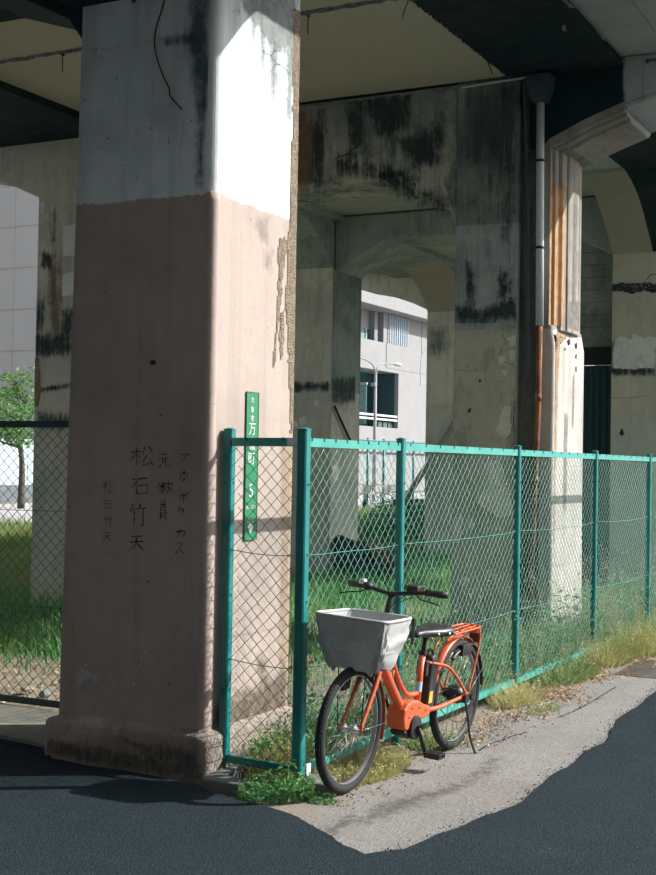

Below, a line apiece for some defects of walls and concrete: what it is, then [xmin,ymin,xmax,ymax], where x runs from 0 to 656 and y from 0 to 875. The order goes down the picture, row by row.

damp [243,0,295,115]
damp [314,110,325,187]
damp [338,94,443,206]
spalling [273,8,307,433]
rust [549,147,566,326]
rust [49,264,62,334]
damp [455,262,516,323]
damp [294,376,355,404]
peeling [496,406,512,439]
peeling [498,335,516,376]
peeling [613,333,656,370]